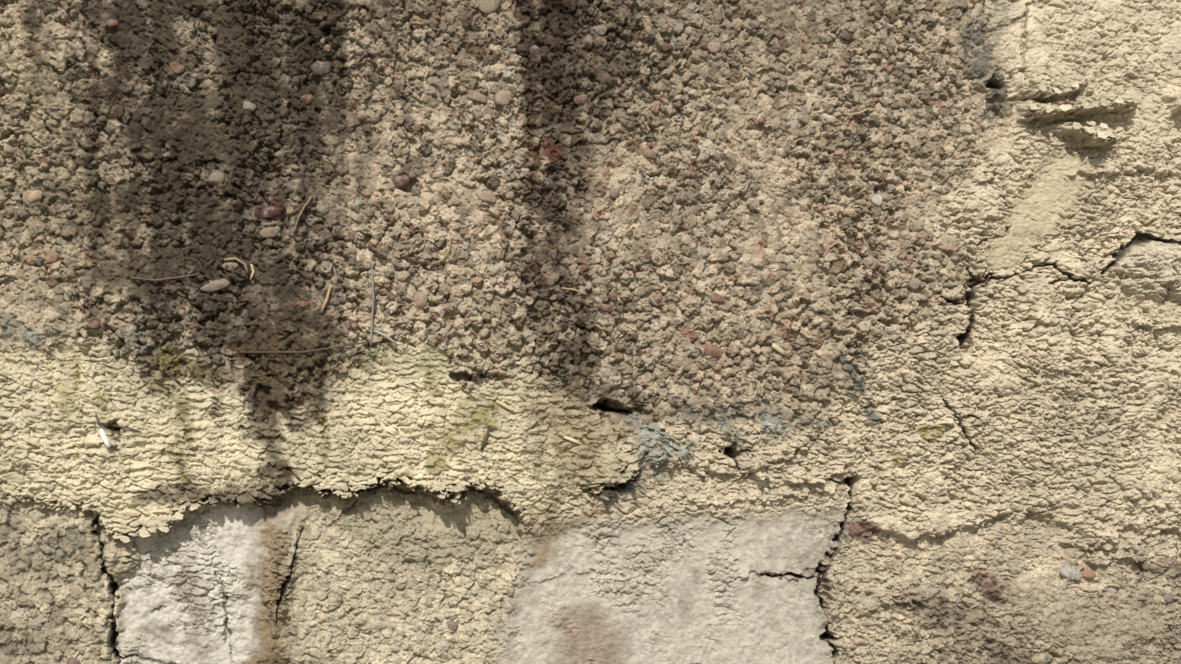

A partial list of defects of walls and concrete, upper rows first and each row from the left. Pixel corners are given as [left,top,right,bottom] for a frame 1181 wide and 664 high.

leakage [23,7,37,47]
leakage [361,0,394,32]
leakage [72,0,368,513]
leakage [520,0,599,288]
spalling [987,150,1093,268]
crack [941,228,1181,343]
peeling [1012,78,1141,146]
crack [942,397,996,466]
crack [90,511,125,658]
spalling [116,493,287,664]
spalling [347,488,848,664]
crack [765,478,853,657]